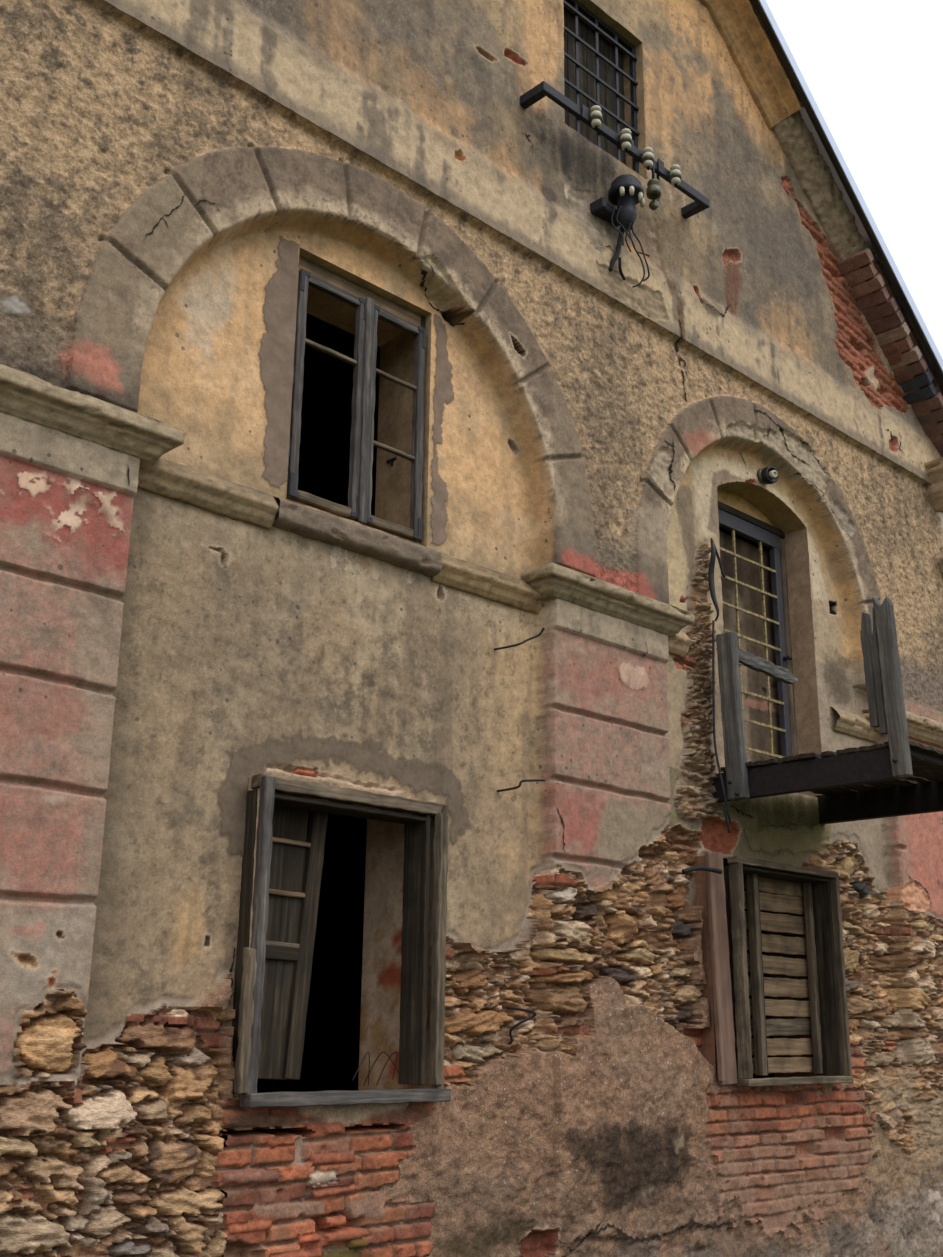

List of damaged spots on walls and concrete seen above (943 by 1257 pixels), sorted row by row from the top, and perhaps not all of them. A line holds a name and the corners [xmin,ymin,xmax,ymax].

crack [145,194,221,239]
flaking render [722,248,742,264]
flaking render [781,175,943,457]
crack [675,304,734,402]
peeling [17,471,123,541]
crack [739,410,849,536]
peeling [42,792,69,806]
spalling [267,764,404,793]
flaking render [443,544,943,1239]
flaking render [0,949,437,1257]
spalling [520,1227,561,1257]
crack [558,1219,740,1253]